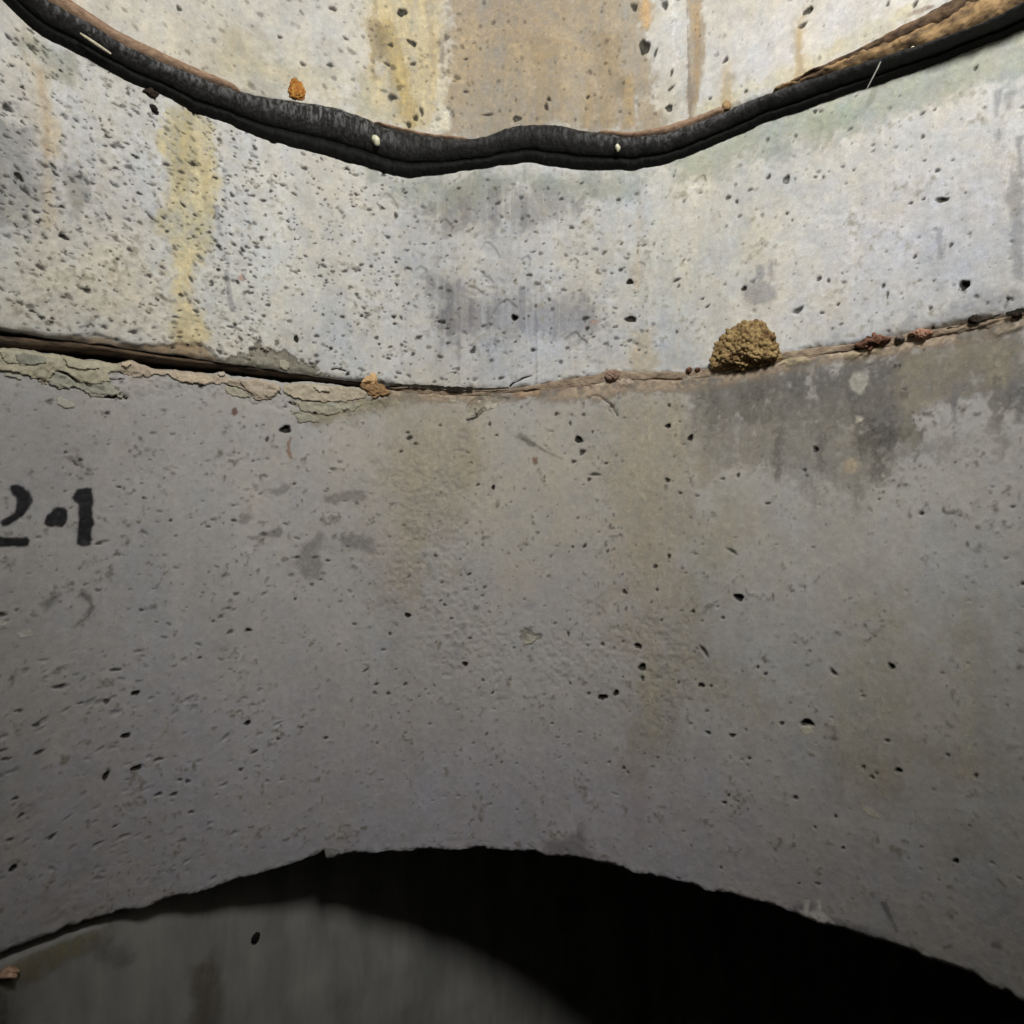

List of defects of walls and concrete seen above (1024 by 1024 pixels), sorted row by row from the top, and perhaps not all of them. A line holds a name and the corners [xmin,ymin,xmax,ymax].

leakage [430,78,450,132]
leakage [225,270,234,311]
peeling [0,340,367,424]
leakage [689,327,1024,492]